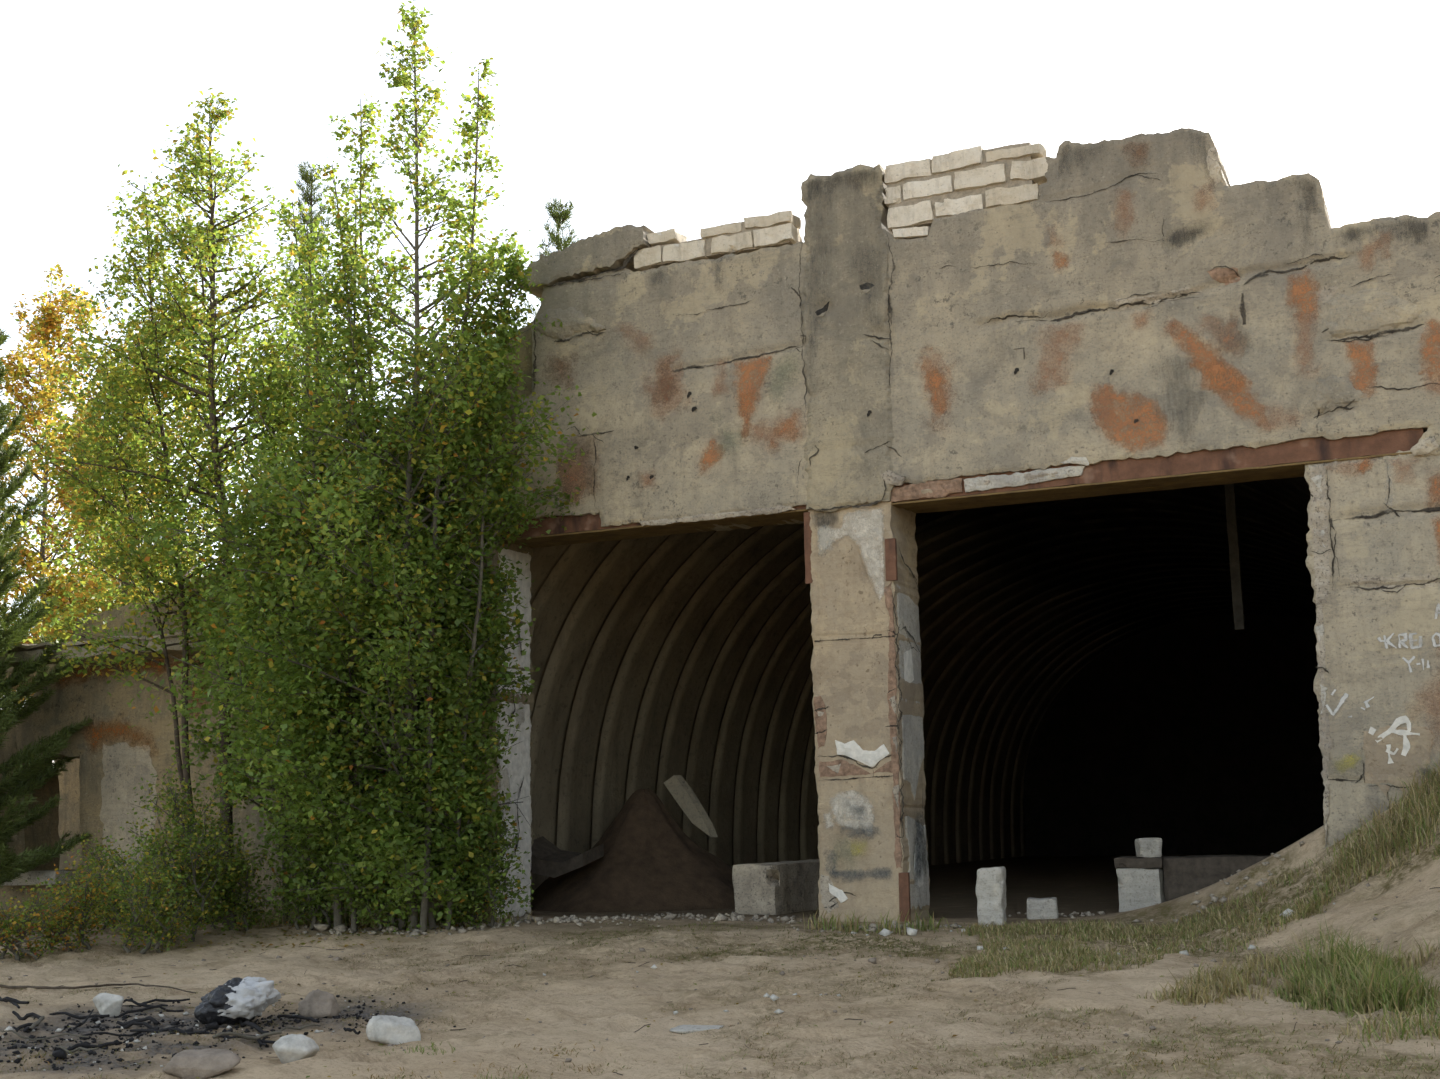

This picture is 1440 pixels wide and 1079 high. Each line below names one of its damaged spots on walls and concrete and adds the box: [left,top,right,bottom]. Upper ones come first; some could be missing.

crack [981,254,1389,326]
crack [1321,324,1423,342]
rust [1171,320,1294,426]
rust [1093,386,1165,450]
peeling [813,457,1090,913]
peeling [851,927,917,936]